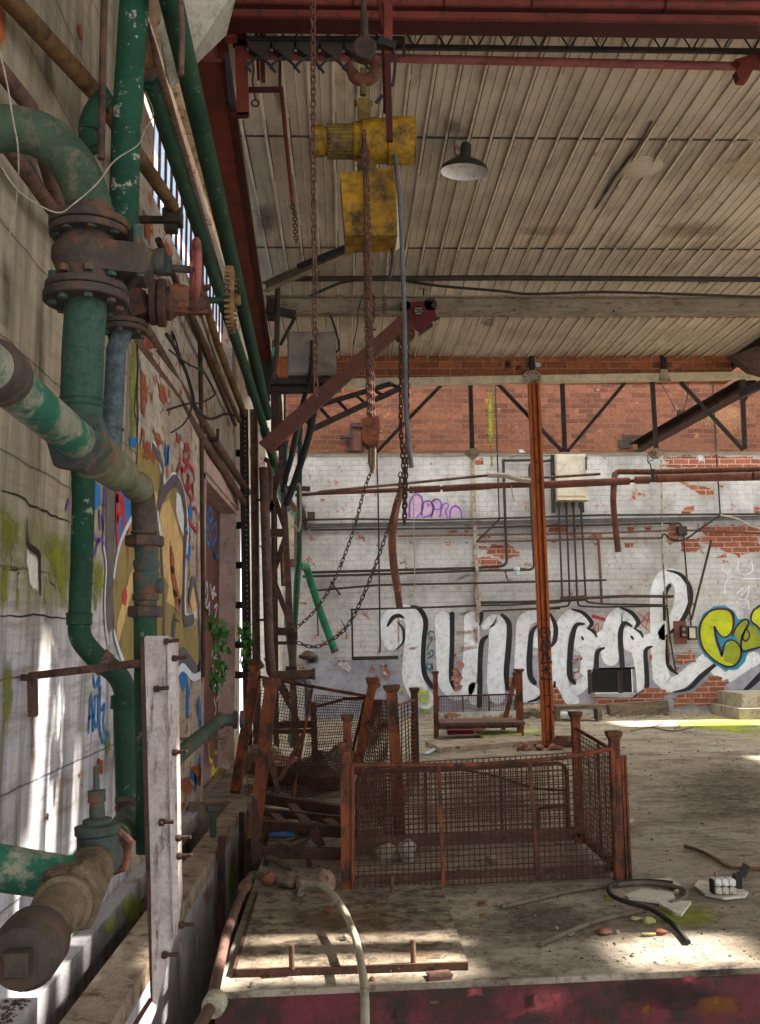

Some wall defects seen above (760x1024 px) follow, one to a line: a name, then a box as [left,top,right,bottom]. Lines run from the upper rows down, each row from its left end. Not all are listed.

spalling [659,455,760,468]
spalling [680,482,724,496]
crack [1,490,71,523]
spalling [667,506,760,558]
spalling [26,518,45,595]
spalling [445,530,520,569]
spalling [591,675,729,707]